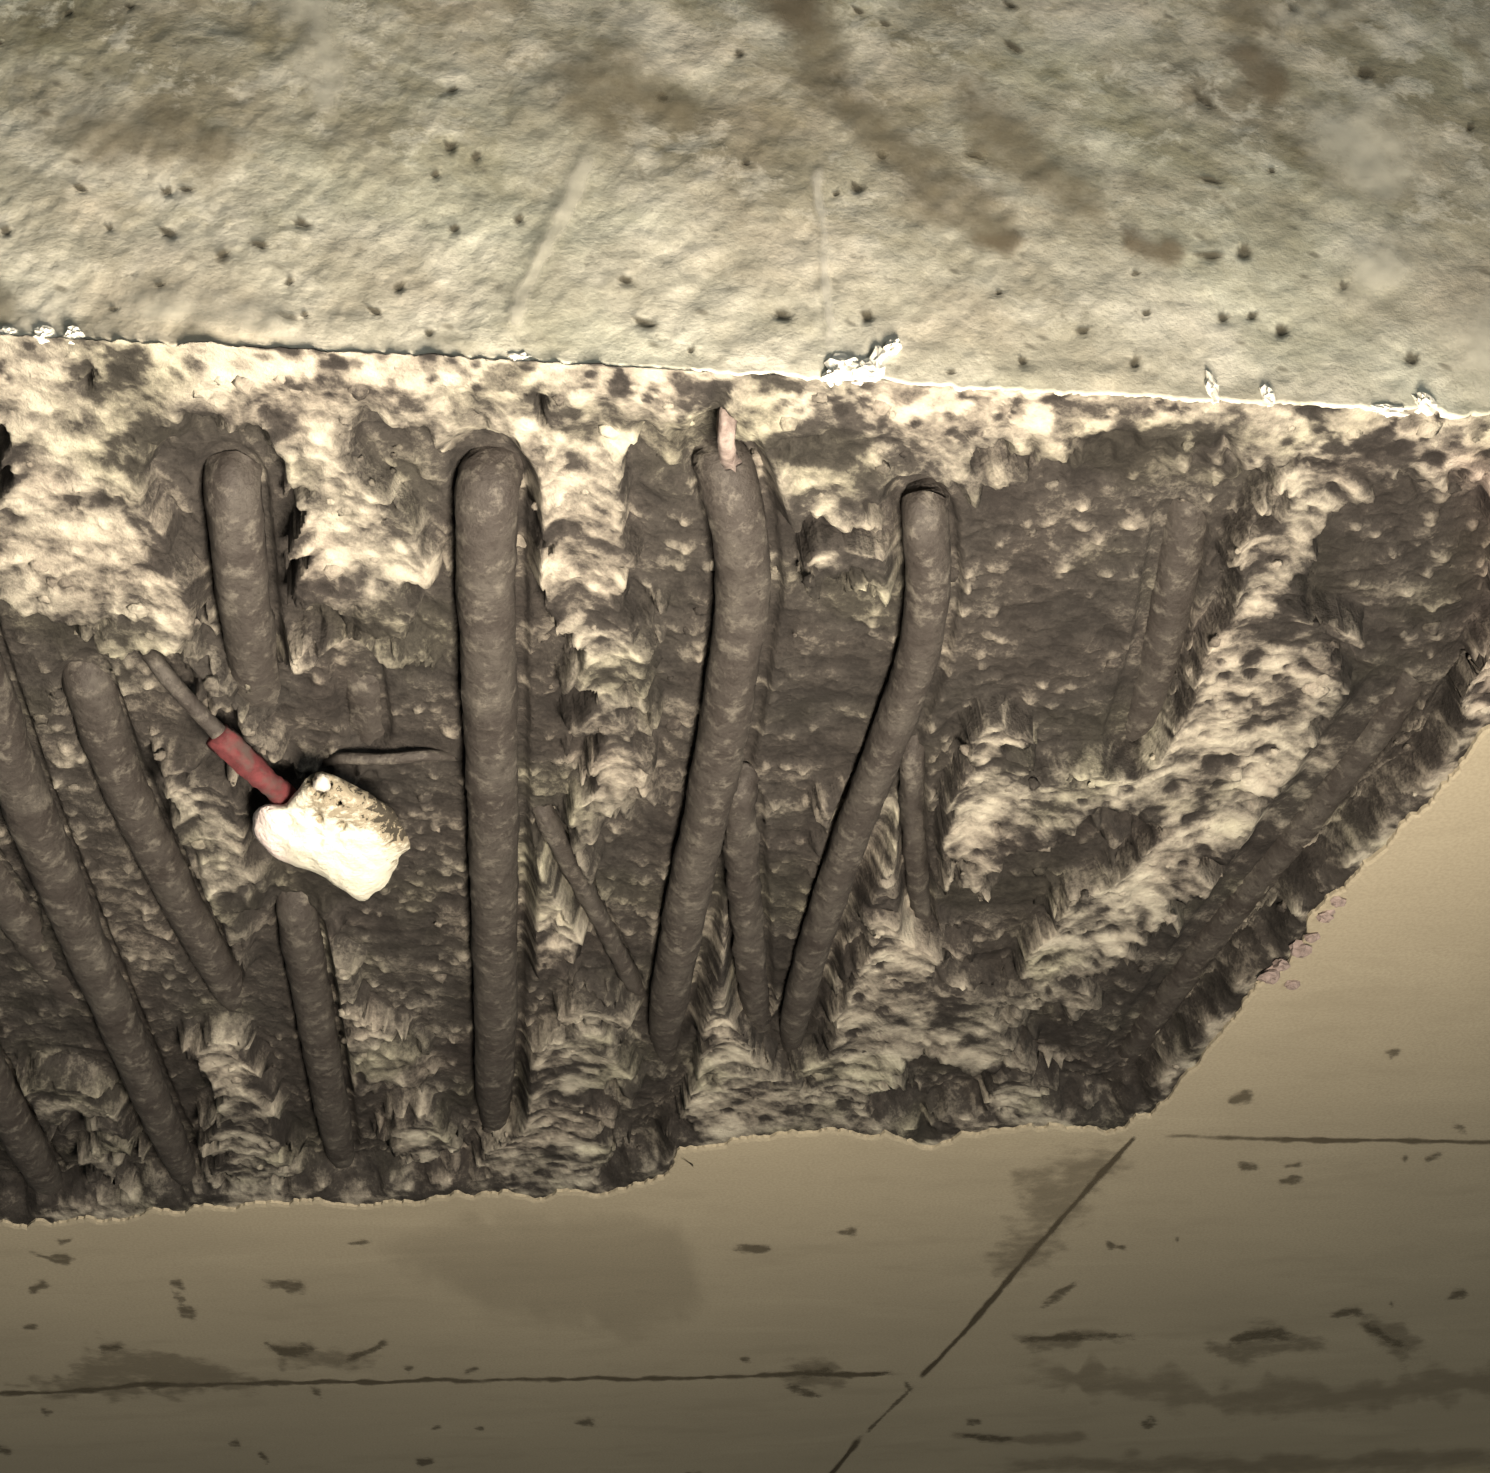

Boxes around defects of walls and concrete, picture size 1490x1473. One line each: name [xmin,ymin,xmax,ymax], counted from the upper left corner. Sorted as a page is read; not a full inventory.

damp [761,0,837,85]
damp [840,103,1021,249]
damp [969,101,1082,202]
spalling [0,334,1490,1225]
crack [1221,1136,1490,1144]
crack [0,1138,1134,1473]